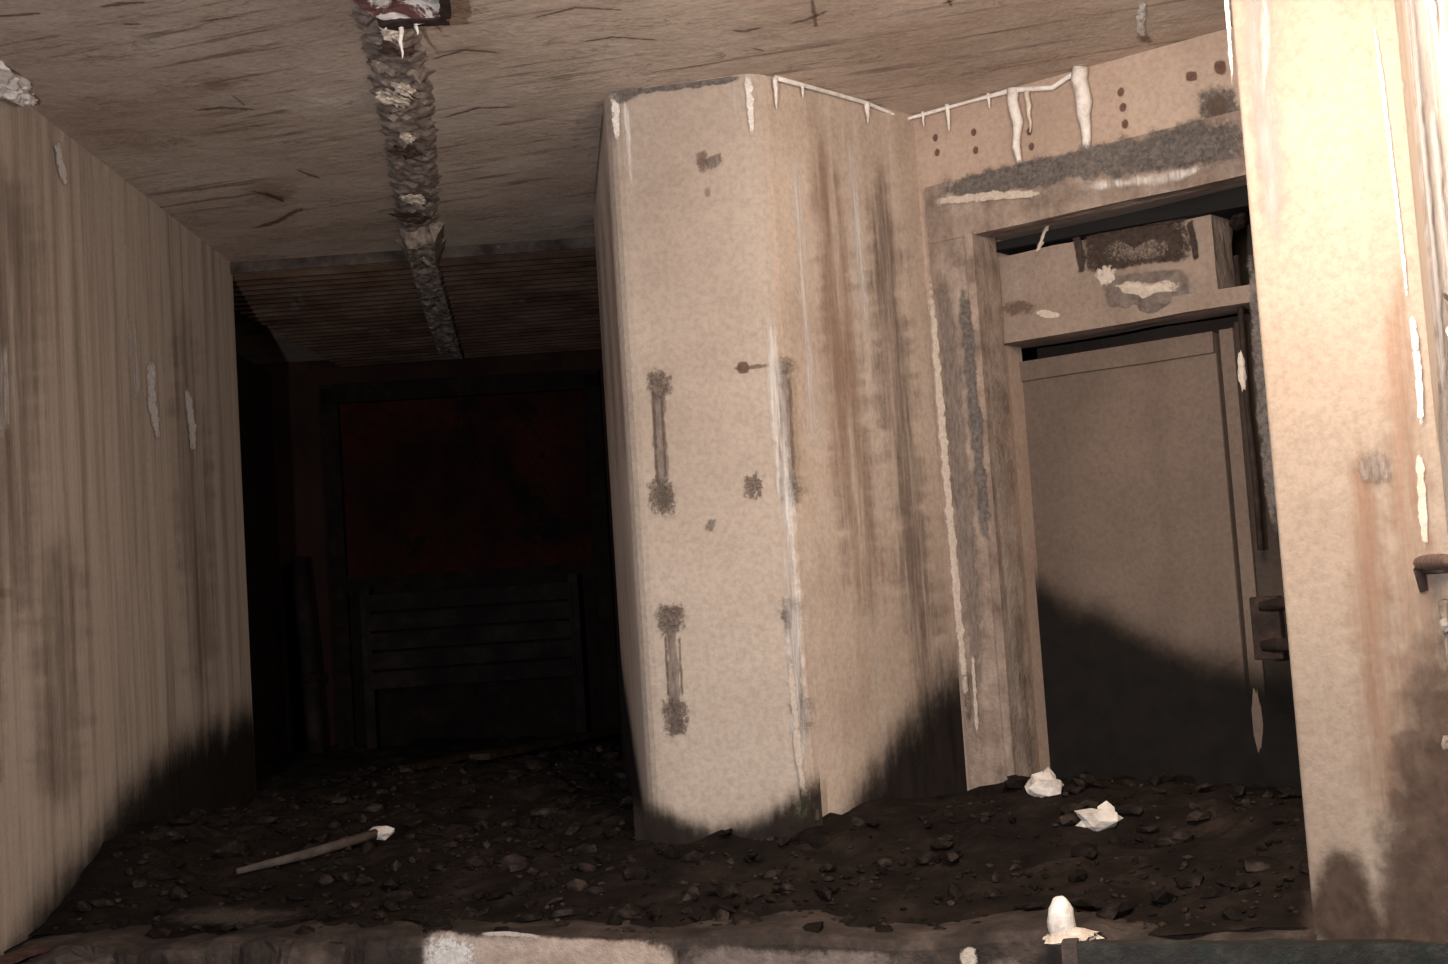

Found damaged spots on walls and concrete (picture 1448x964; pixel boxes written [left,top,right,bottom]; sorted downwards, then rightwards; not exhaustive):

crack [0,11,40,19]
crack [101,1,144,25]
peeling [378,26,399,42]
crack [200,96,252,111]
peeling [374,82,417,108]
damp [937,0,1279,222]
peeling [400,132,418,144]
crack [256,169,320,228]
peeling [400,194,426,207]
rust [1381,665,1448,943]
spalling [423,931,898,964]
spalling [960,947,1019,964]